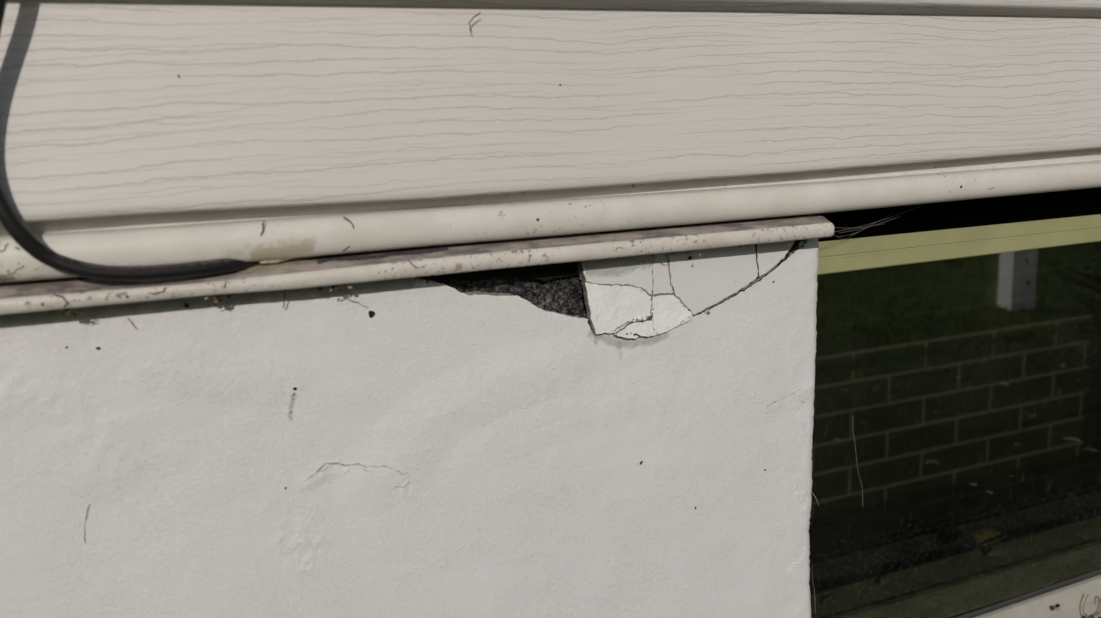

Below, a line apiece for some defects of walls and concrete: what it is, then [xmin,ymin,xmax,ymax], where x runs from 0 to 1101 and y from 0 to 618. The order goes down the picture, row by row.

peeling [414,240,795,339]
crack [615,239,807,336]
crack [295,456,422,510]